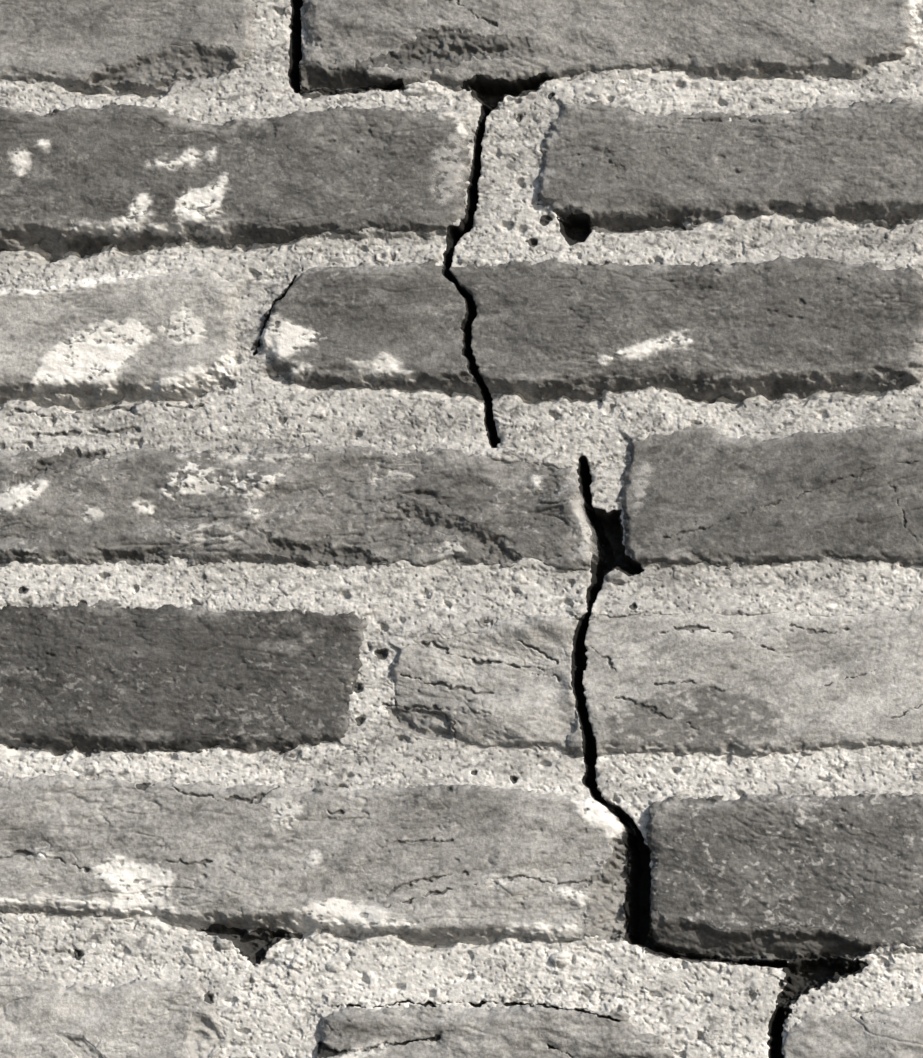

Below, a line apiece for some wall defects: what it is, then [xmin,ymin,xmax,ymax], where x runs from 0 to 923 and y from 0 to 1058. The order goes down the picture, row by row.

crack [288,0,404,95]
crack [444,0,498,27]
crack [686,116,760,124]
crack [441,73,554,448]
crack [253,258,303,356]
crack [662,461,923,545]
crack [890,704,923,719]
crack [376,455,868,1058]
crack [317,1034,441,1058]
crack [337,1000,620,1022]